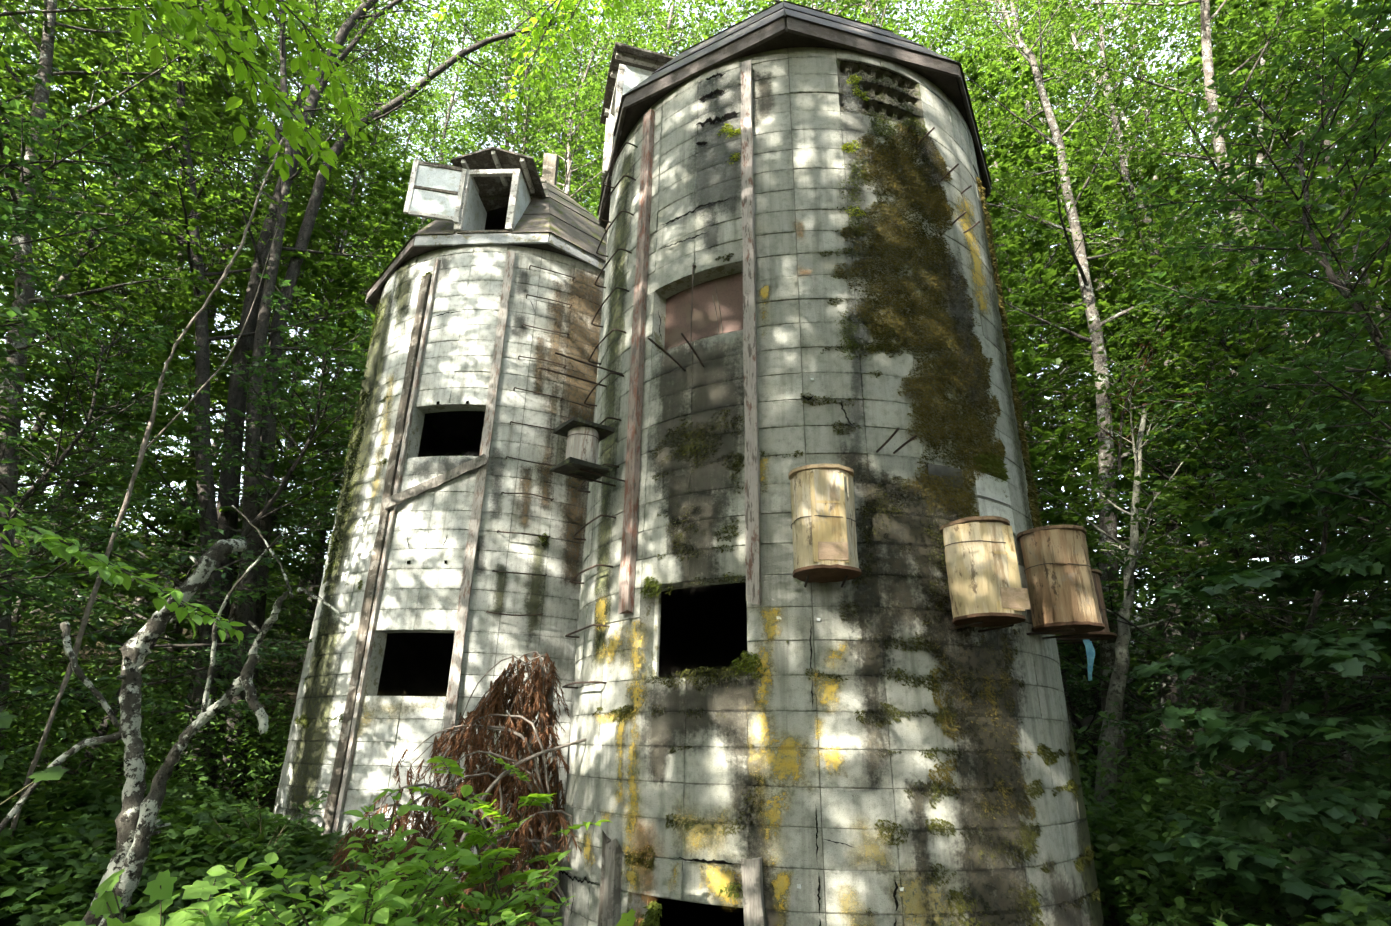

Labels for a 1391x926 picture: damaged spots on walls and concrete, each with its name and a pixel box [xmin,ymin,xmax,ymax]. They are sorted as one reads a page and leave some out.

damp [690,70,774,249]
damp [839,76,868,271]
damp [437,258,450,281]
damp [412,456,474,478]
damp [490,149,635,664]
damp [475,536,507,615]
damp [597,285,1105,926]
damp [577,834,595,866]